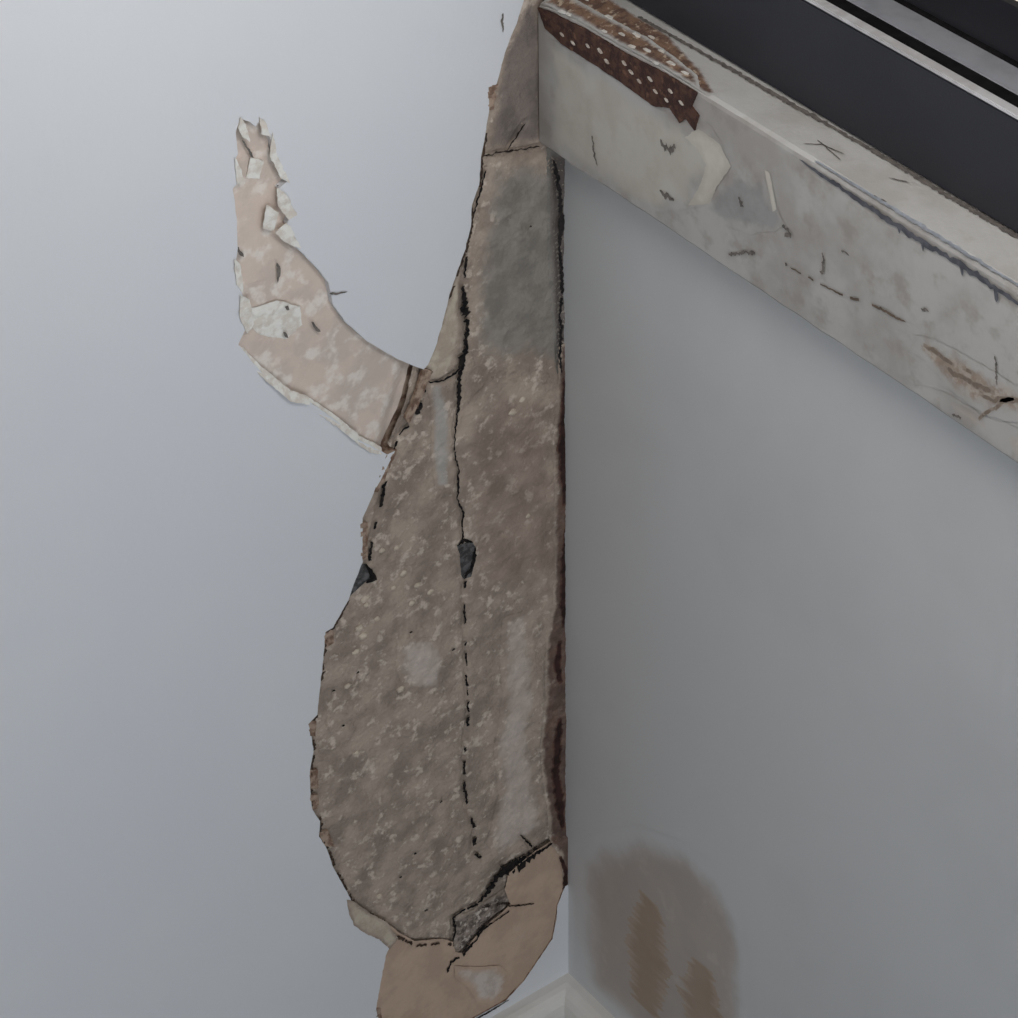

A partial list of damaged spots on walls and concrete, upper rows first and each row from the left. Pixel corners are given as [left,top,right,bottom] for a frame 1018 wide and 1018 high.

rust [540,0,718,95]
crack [368,481,387,561]
crack [394,124,565,540]
spalling [233,0,791,1018]
crack [447,581,552,973]
water stain [576,824,751,1018]